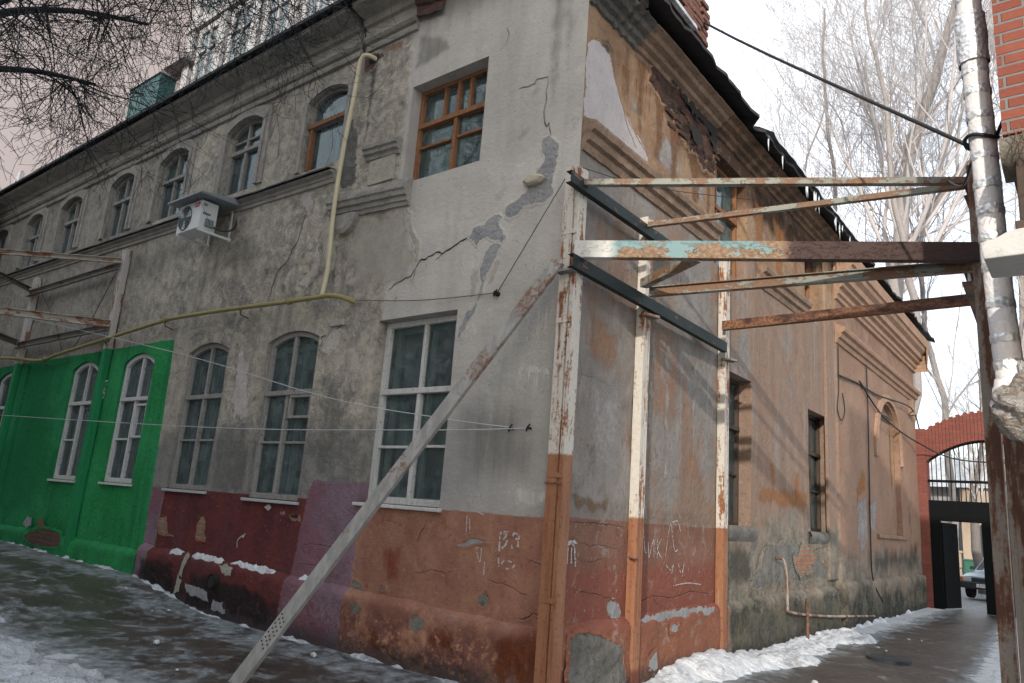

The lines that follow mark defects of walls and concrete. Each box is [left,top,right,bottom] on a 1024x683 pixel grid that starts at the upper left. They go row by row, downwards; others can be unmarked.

crack [519,66,568,146]
flaking render [647,64,720,178]
crack [389,236,471,290]
flaking render [455,134,562,343]
flaking render [23,516,63,551]
flaking render [173,513,225,614]
flaking render [219,564,233,576]
flaking render [751,538,829,593]
flaking render [641,606,715,636]
flaking render [564,627,627,683]
flaking render [646,648,659,675]